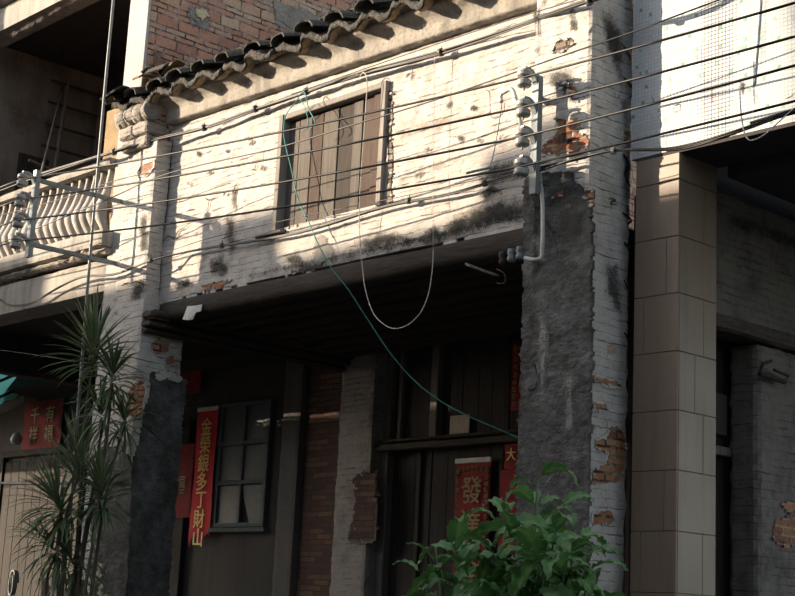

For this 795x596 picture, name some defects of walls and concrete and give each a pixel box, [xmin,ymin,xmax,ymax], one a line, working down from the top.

spalling [549,37,575,54]
damp [603,11,624,92]
spalling [541,116,590,156]
damp [264,162,541,276]
damp [604,263,622,322]
peeling [150,337,183,383]
peeling [126,380,148,454]
peeling [592,423,628,485]
peeling [347,469,381,545]
peeling [771,500,795,549]